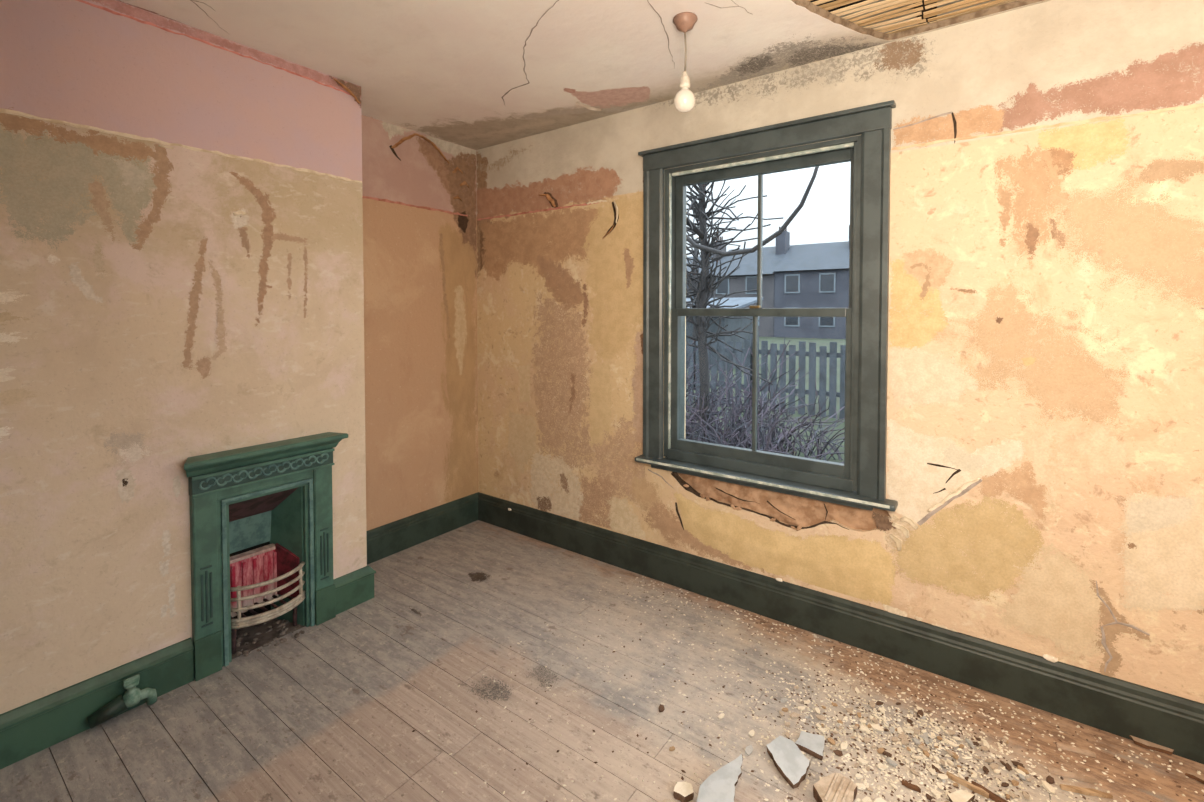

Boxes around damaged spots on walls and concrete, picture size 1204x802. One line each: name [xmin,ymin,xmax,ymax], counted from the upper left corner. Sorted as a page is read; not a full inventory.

crack [501,0,559,105]
crack [647,0,673,61]
leakage [695,34,942,108]
flaking render [792,0,1044,40]
peeling [891,41,1204,178]
peeling [444,145,643,447]